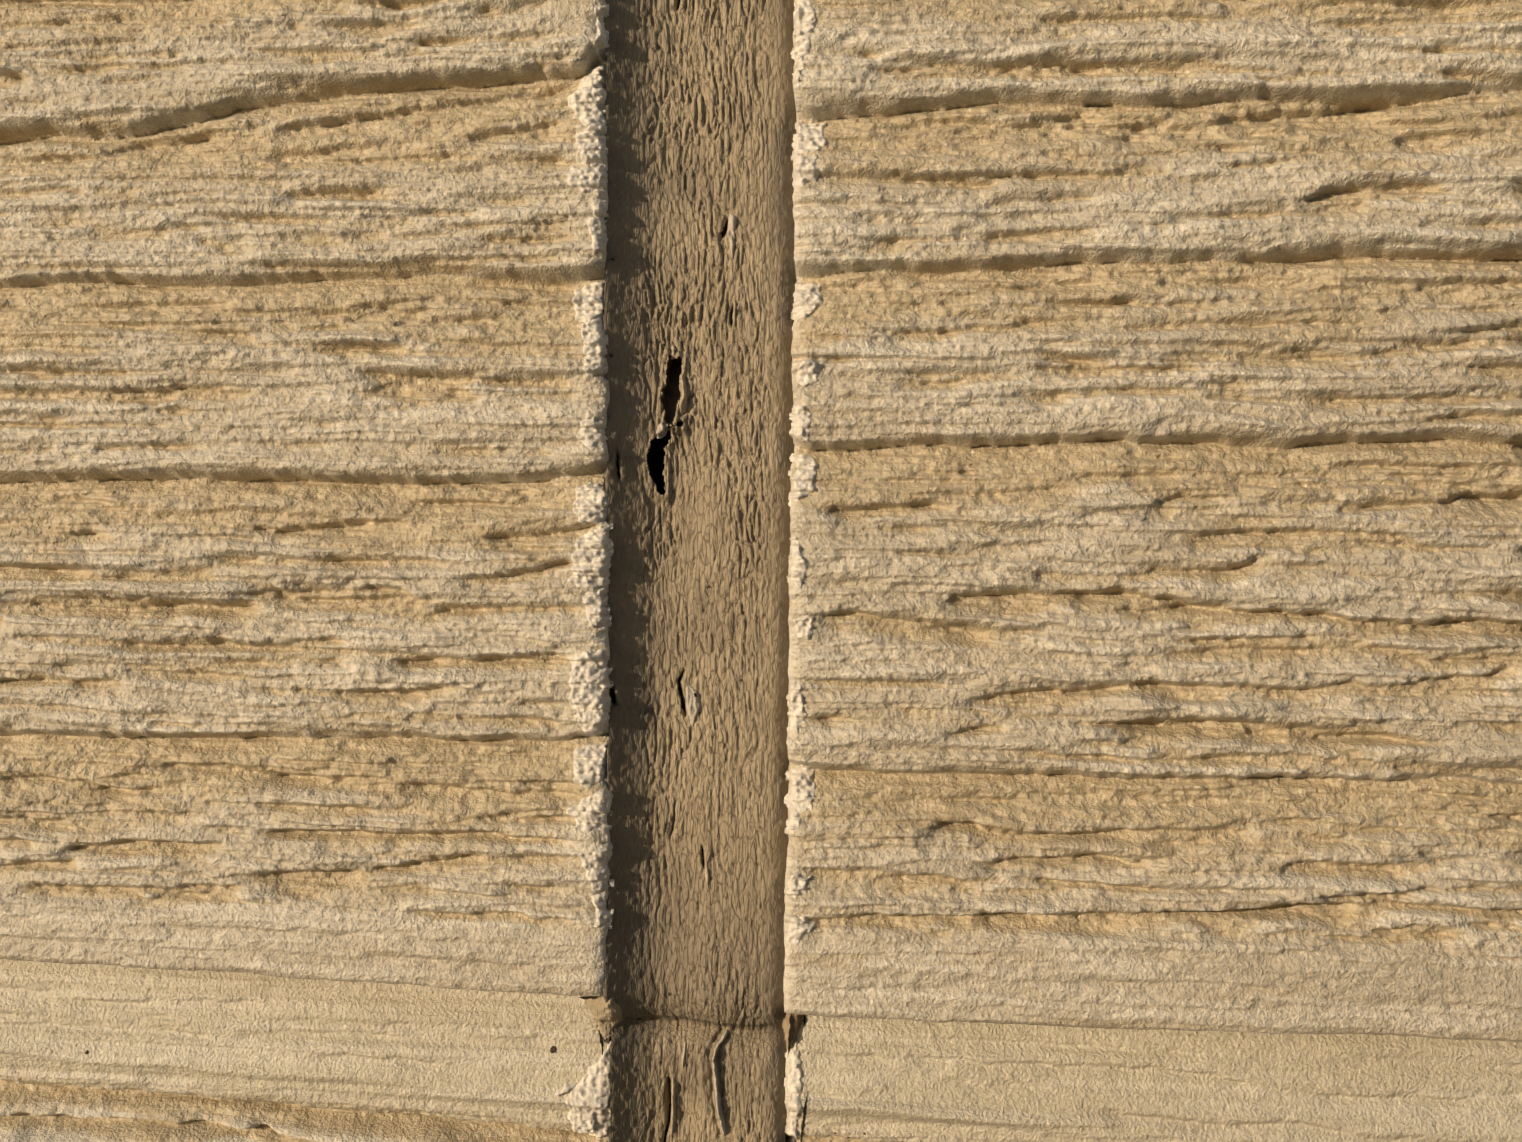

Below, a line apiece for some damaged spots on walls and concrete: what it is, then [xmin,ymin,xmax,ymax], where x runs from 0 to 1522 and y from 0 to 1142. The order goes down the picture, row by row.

crack [616,345,687,501]
crack [664,1076,675,1142]